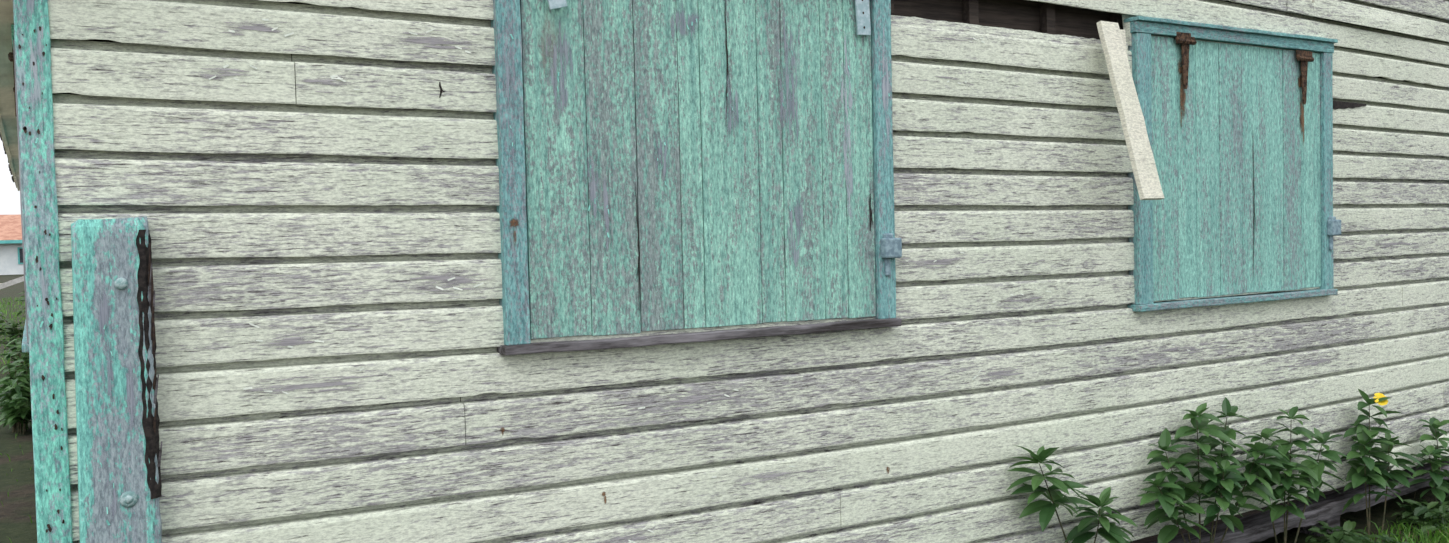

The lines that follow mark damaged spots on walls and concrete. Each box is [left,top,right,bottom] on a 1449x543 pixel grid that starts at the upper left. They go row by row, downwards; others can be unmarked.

corrosion [1178,60,1186,127]
peeling [98,280,135,429]